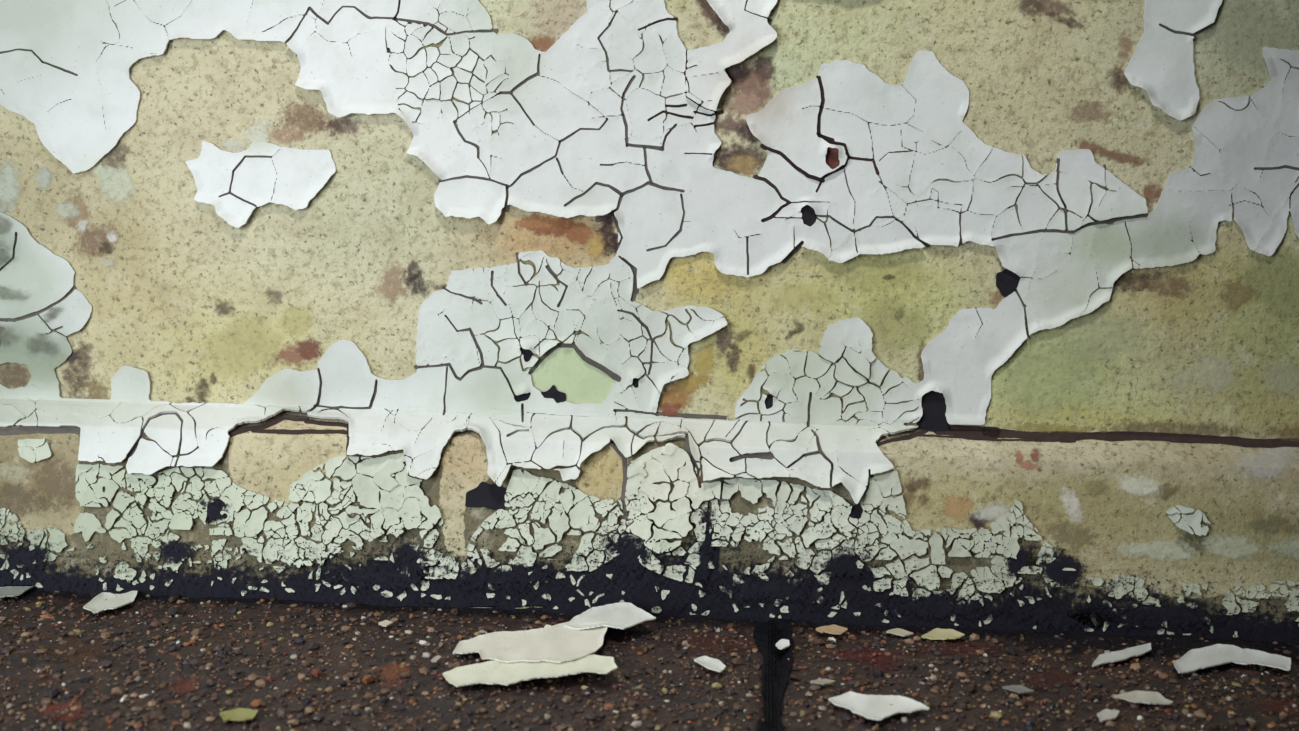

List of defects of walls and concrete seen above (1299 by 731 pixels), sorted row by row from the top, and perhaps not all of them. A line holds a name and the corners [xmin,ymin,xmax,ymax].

crack [285,0,499,53]
crack [414,0,1299,522]
peeling [18,438,52,463]
crack [127,413,183,468]
crack [228,368,378,456]
flaking render [266,420,347,431]
peeling [609,443,721,583]
peeling [498,521,555,572]
peeling [565,533,619,572]
leakage [0,498,1299,644]
peeling [777,537,831,585]
crack [753,619,794,731]